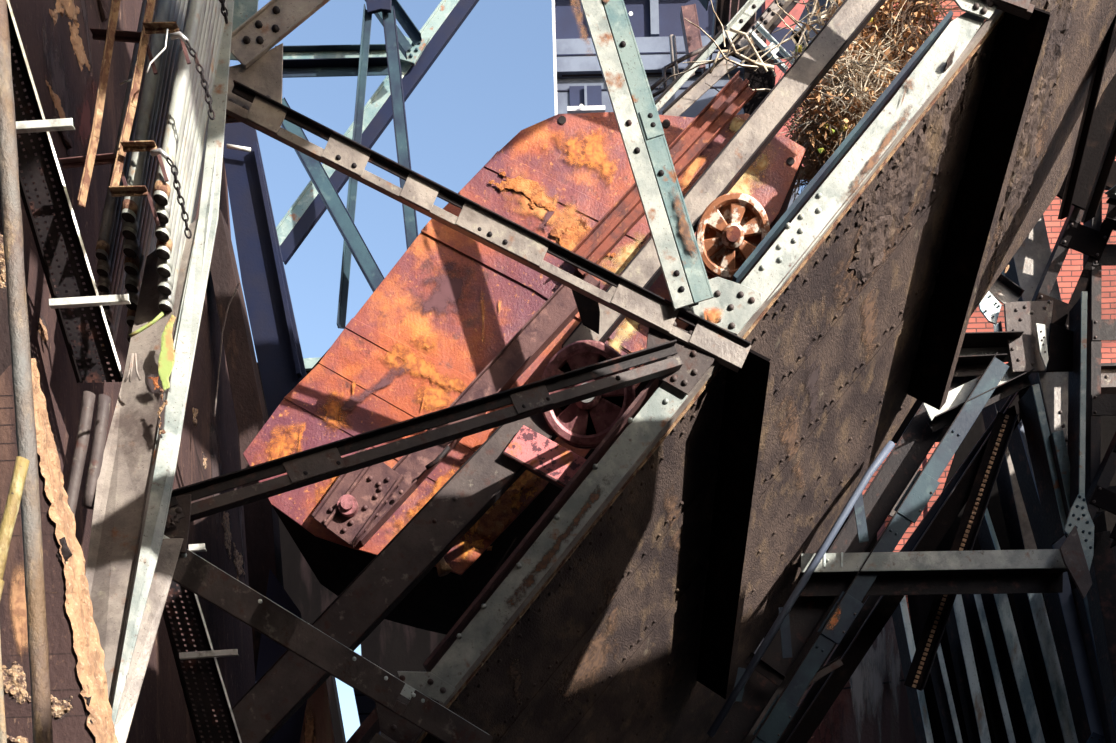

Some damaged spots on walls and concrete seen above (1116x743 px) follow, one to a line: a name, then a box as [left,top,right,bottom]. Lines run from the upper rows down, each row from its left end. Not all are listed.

spalling [49,0,90,72]
rust [544,130,618,183]
rust [510,186,587,240]
rust [672,156,707,254]
rust [416,261,501,340]
rust [704,308,722,322]
rust [323,343,466,427]
rust [266,423,306,461]
rust [779,398,804,488]
rust [396,463,464,529]
rust [460,470,541,559]
rust [505,479,605,621]